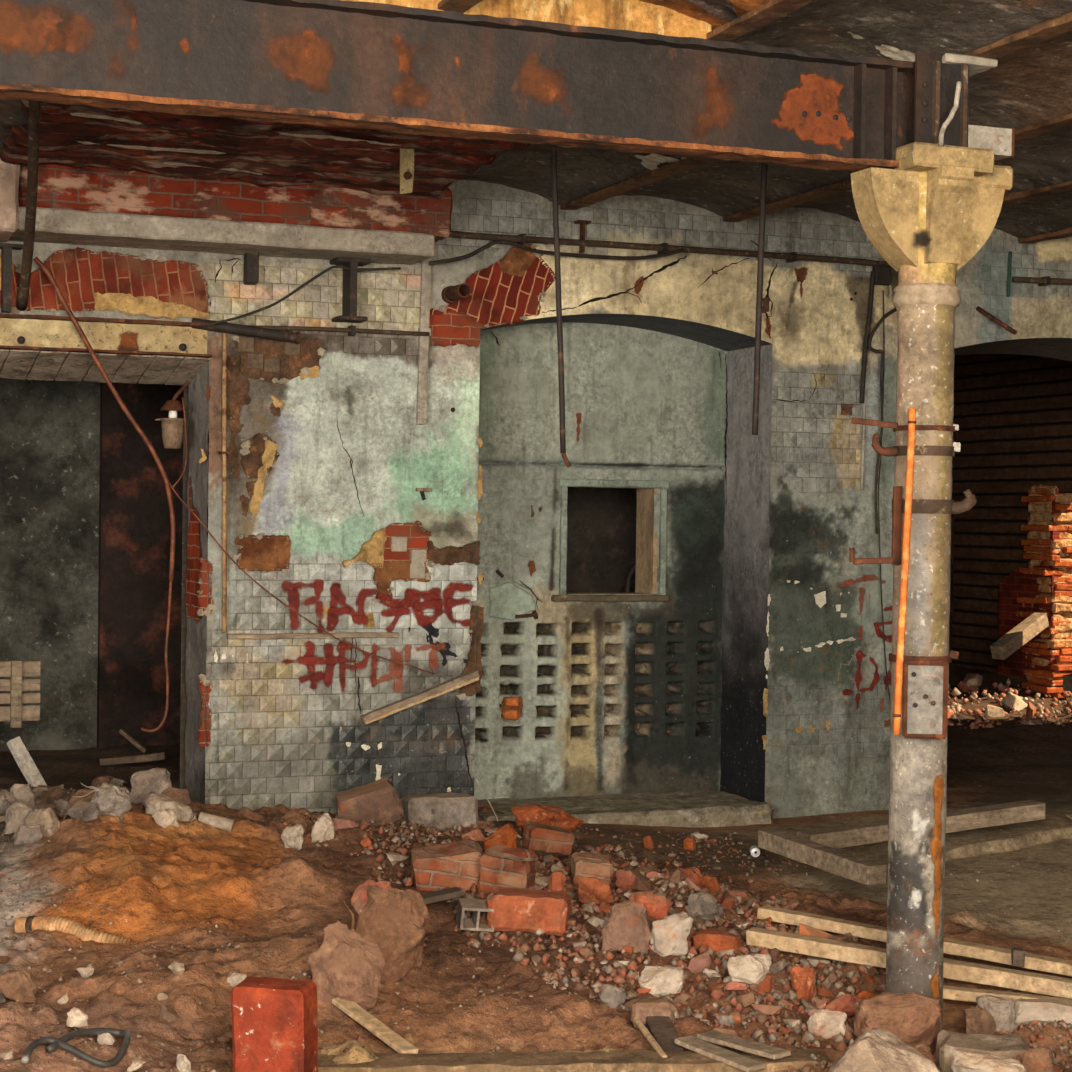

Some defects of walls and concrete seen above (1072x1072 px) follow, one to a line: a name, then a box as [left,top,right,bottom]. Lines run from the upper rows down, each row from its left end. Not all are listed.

corrosion [0,3,89,52]
spalling [0,100,531,199]
corrosion [521,57,564,102]
corrosion [771,73,854,150]
flaking render [0,247,211,319]
flaking render [429,244,555,348]
crack [542,256,687,313]
crack [697,240,778,338]
peeling [227,336,326,519]
crack [337,421,364,516]
flaking render [342,521,483,627]
corrosion [930,775,944,936]